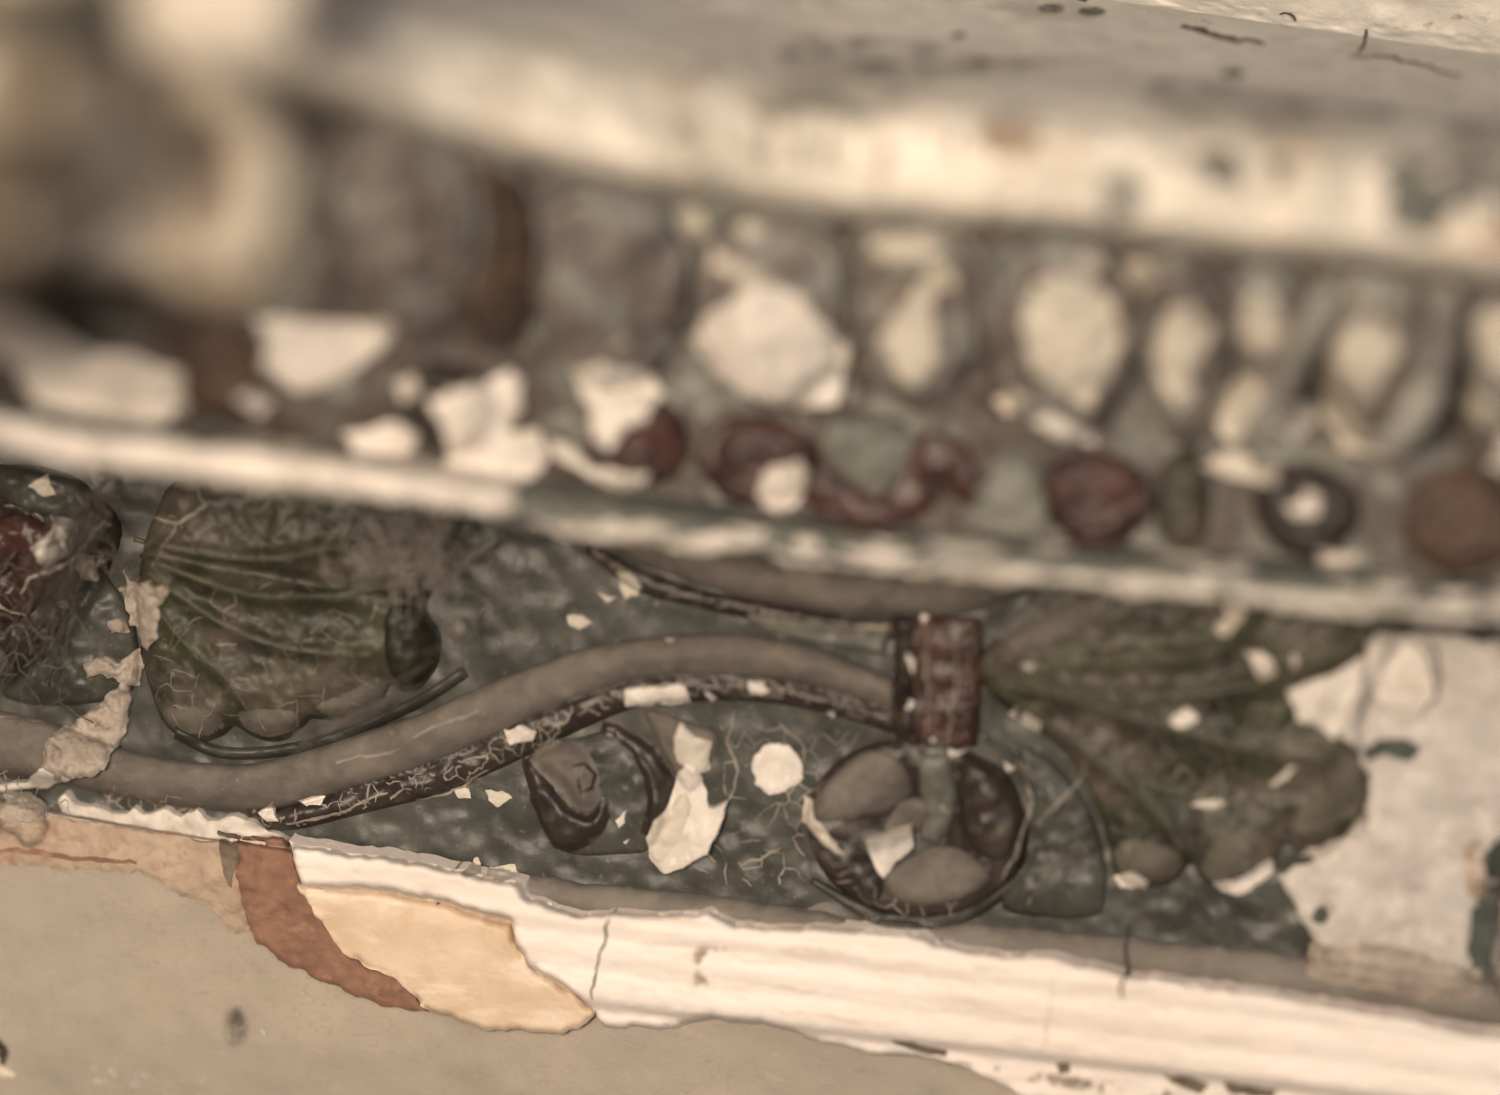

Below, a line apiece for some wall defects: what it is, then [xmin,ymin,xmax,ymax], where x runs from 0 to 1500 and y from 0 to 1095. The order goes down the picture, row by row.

crack [1180,12,1296,45]
crack [1350,29,1463,76]
peeling [672,206,709,240]
peeling [866,235,943,260]
peeling [1020,249,1153,411]
flaking render [0,282,1500,1034]
crack [590,908,618,1000]
crack [1119,925,1131,999]
peeling [0,1041,15,1078]
peeling [891,1039,947,1057]
peeling [1056,1063,1070,1074]
peeling [1163,1074,1278,1095]